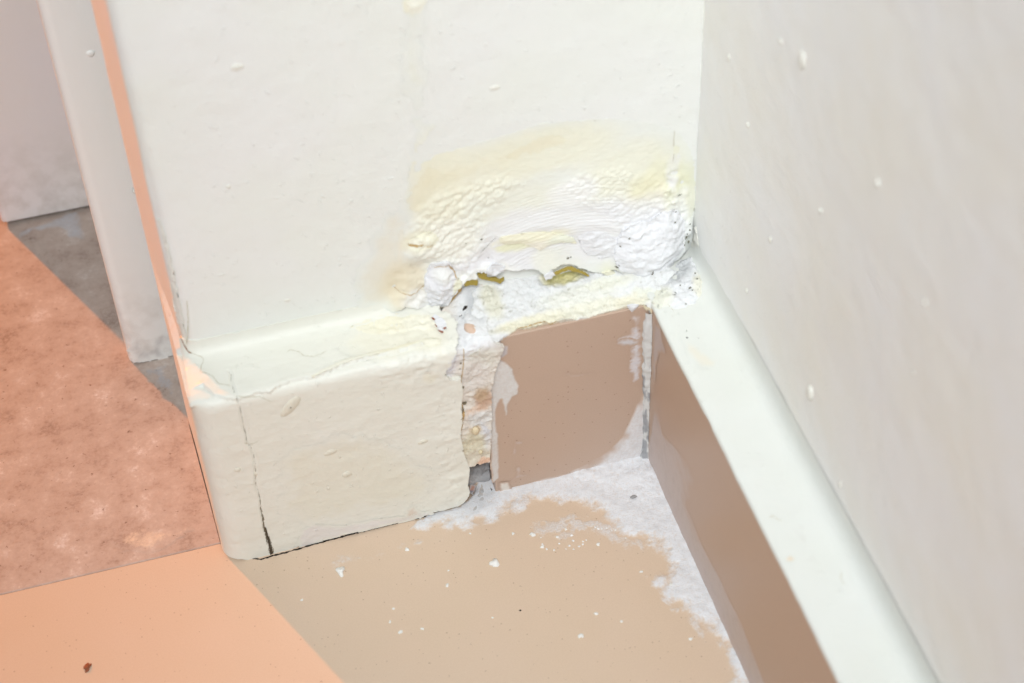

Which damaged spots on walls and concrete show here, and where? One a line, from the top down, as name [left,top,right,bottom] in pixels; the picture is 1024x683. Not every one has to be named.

water stain [334,125,584,387]
peeling [397,118,696,467]
water stain [624,145,695,221]
crack [177,303,274,555]